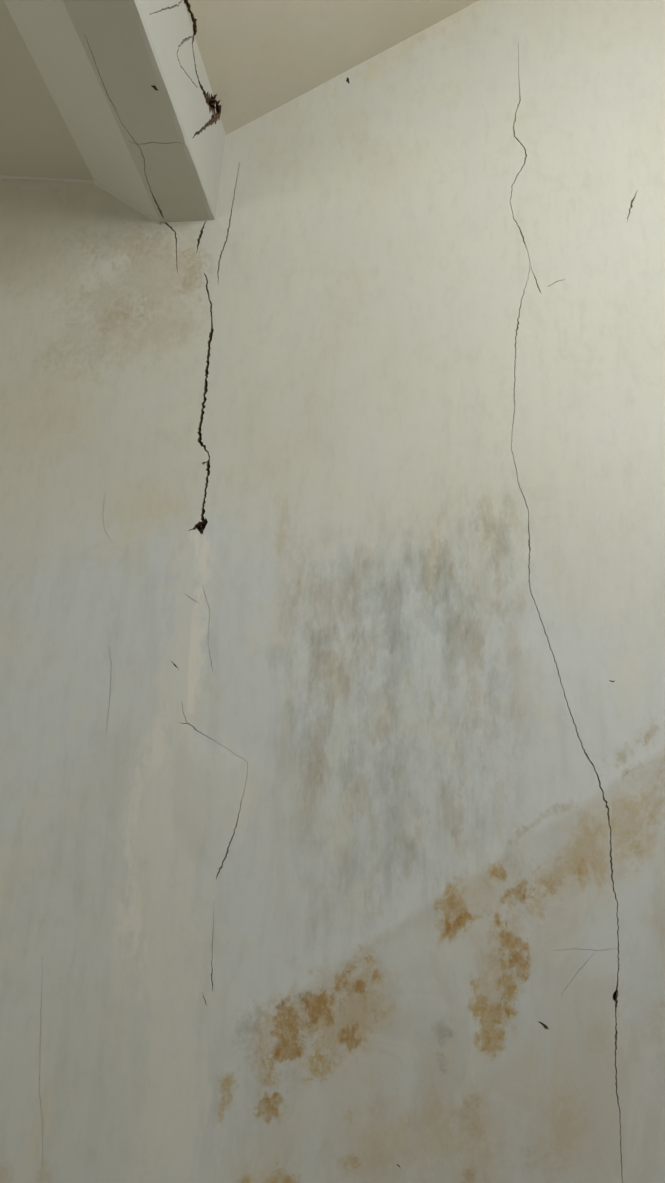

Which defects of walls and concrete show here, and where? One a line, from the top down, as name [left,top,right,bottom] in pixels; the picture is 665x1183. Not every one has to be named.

crack [87,0,239,534]
crack [203,913,214,1004]
crack [181,701,248,879]
crack [510,46,623,1183]